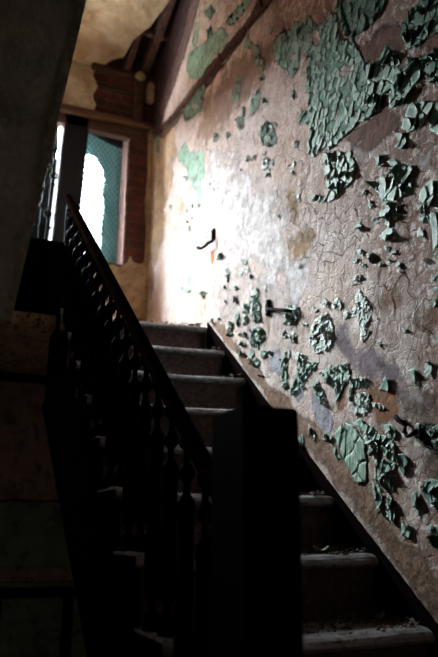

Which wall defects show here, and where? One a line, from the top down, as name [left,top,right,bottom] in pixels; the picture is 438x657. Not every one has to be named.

flaking render [152,0,273,155]
peeling [269,0,438,273]
peeling [177,120,438,623]
crack [366,218,435,349]